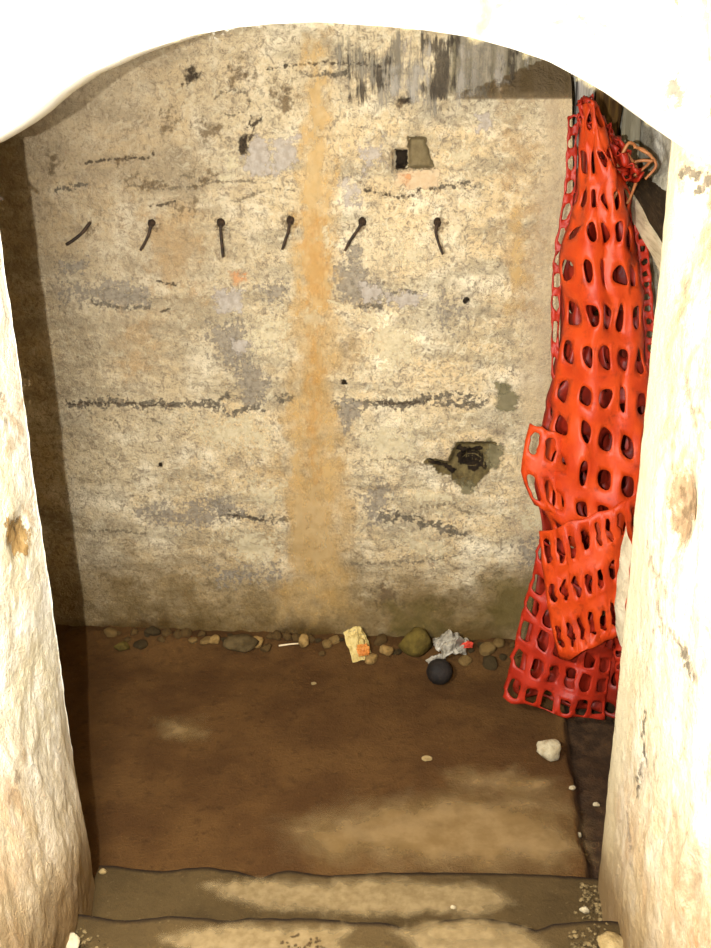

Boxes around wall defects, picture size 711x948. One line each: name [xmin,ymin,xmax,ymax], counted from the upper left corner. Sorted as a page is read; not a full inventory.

leakage [338,31,485,116]
leakage [495,49,528,83]
spalling [394,136,441,190]
spalling [351,417,504,518]